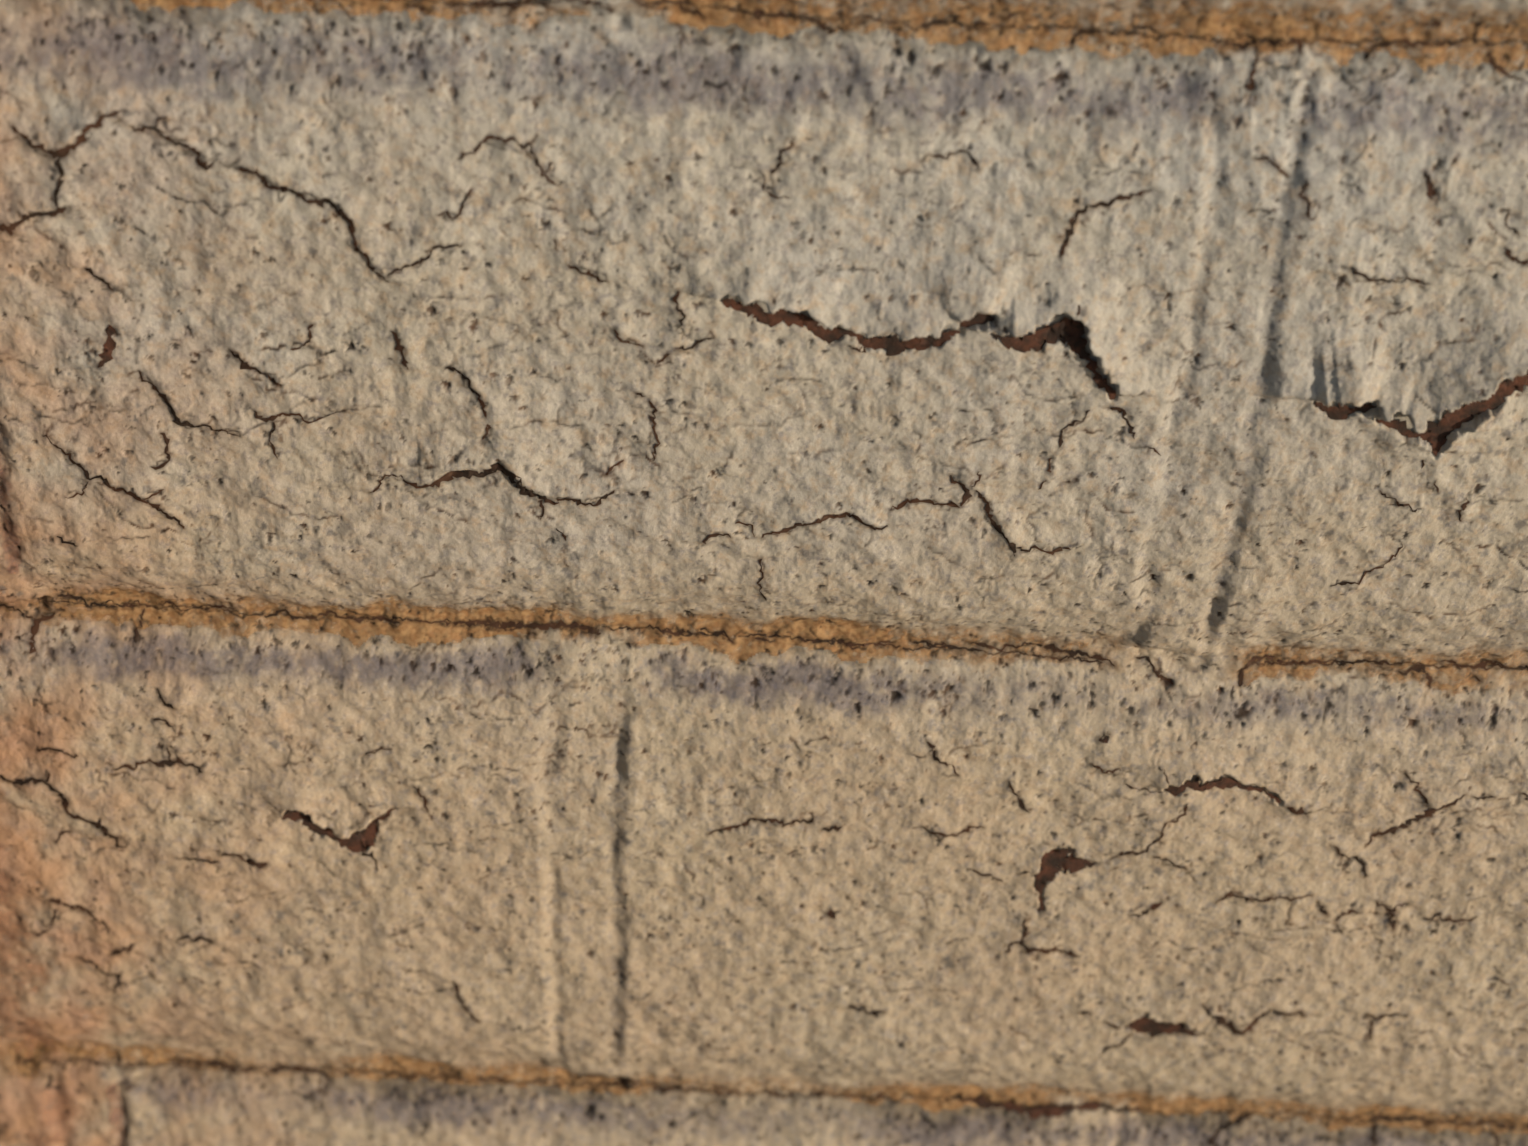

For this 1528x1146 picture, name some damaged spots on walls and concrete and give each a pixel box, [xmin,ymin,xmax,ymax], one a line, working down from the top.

crack [0,111,555,282]
crack [85,268,114,292]
crack [43,324,344,528]
crack [370,291,713,541]
crack [0,471,1173,685]
crack [113,689,202,773]
crack [0,748,127,848]
peeling [967,848,1096,914]
crack [1119,805,1187,870]
crack [1216,774,1528,933]
crack [32,899,134,992]
crack [1202,1004,1307,1035]